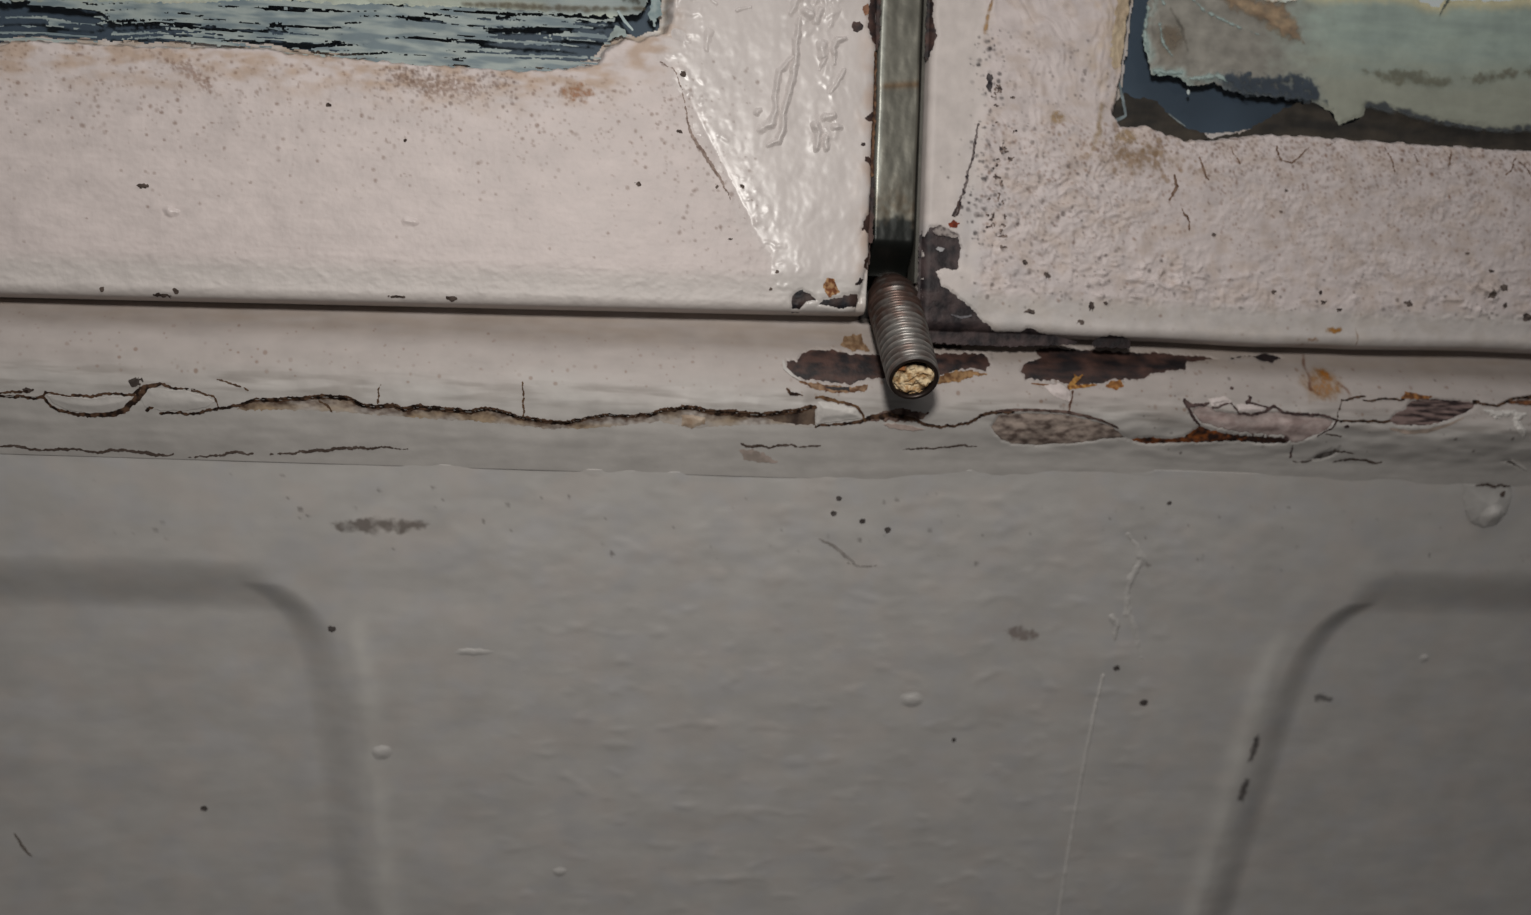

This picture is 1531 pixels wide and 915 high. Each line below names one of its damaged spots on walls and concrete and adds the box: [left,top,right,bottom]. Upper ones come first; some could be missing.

peeling [782,334,886,393]
peeling [917,199,1382,464]
crack [0,377,1015,463]
peeling [1390,391,1477,434]